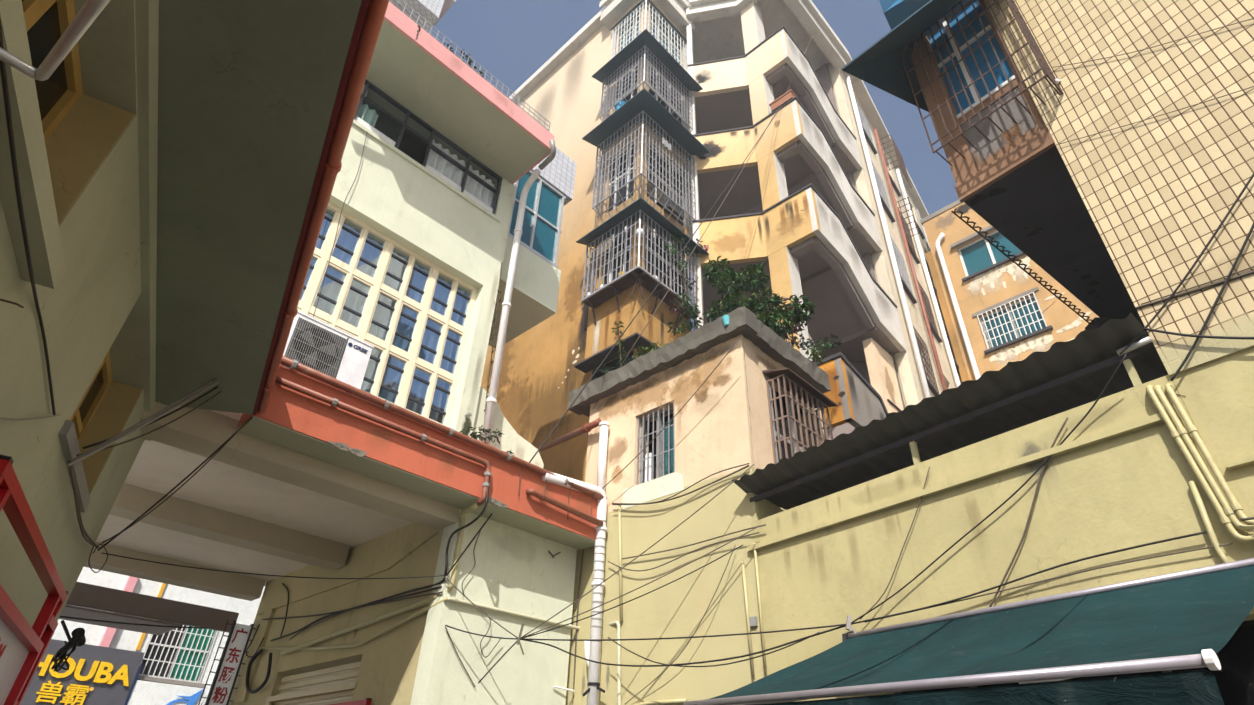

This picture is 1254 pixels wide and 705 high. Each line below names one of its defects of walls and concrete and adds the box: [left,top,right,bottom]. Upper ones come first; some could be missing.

flaking render [967,256,1031,295]
flaking render [989,311,1091,362]